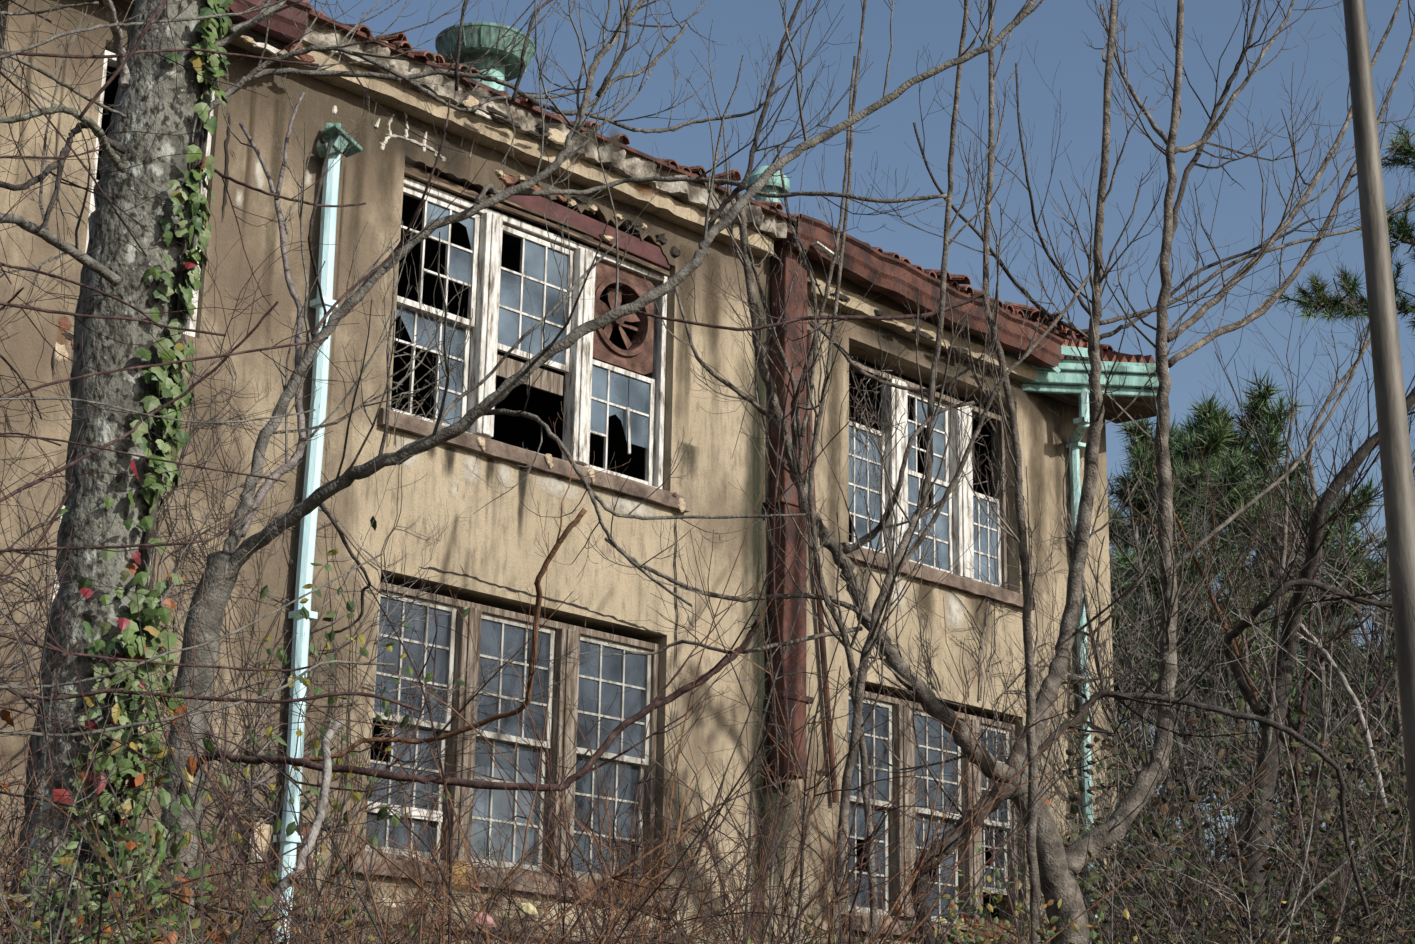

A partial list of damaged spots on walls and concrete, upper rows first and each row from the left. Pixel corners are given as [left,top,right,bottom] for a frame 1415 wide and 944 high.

spalling [463,94,565,145]
peeling [374,113,446,162]
spalling [495,170,680,258]
leakage [683,444,695,465]
leakage [402,441,527,528]
leakage [546,477,569,493]
leakage [616,494,645,515]
leakage [918,583,933,614]
leakage [950,598,989,632]